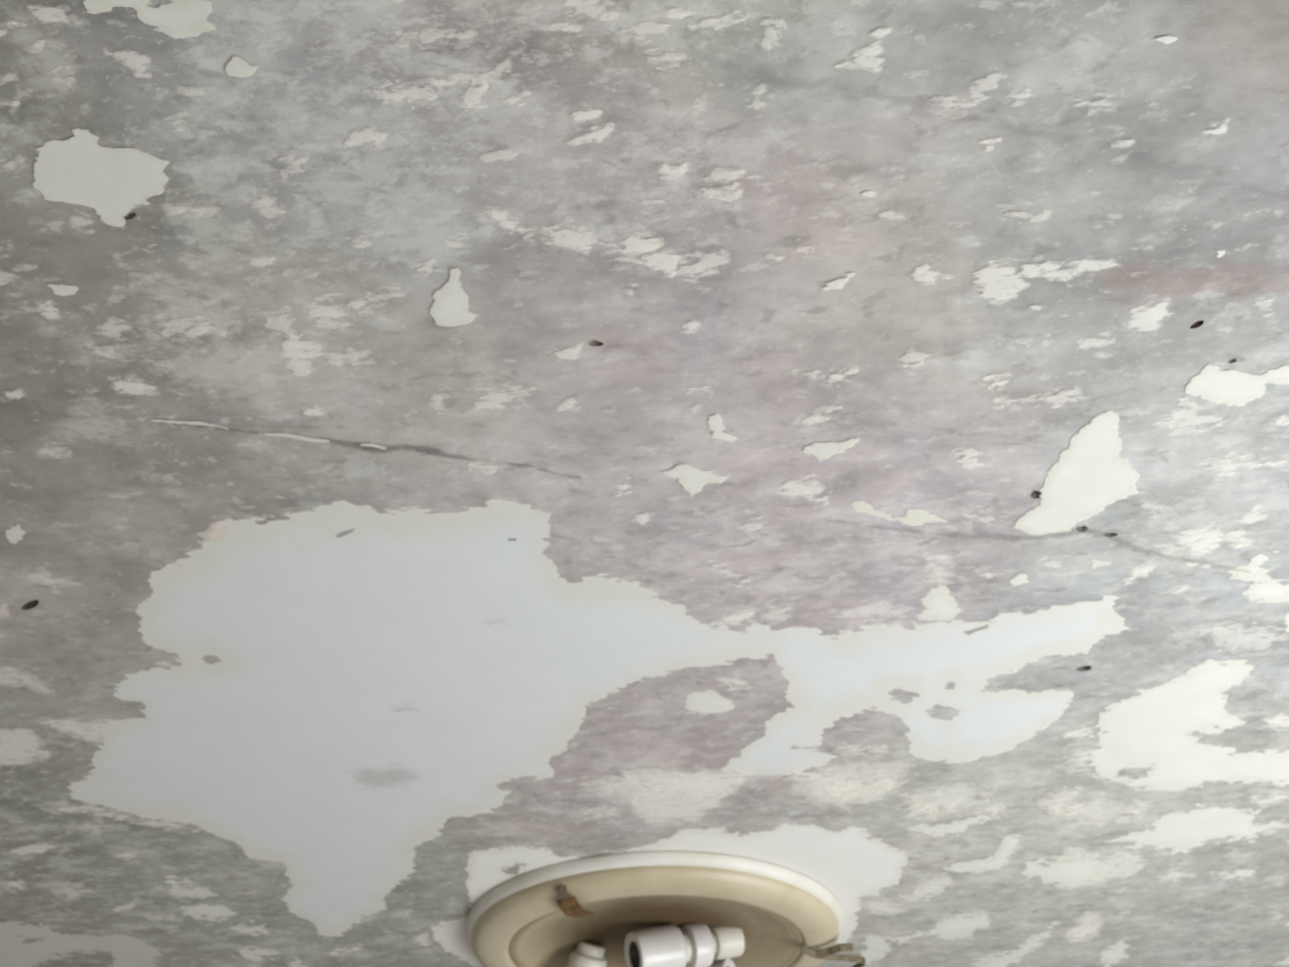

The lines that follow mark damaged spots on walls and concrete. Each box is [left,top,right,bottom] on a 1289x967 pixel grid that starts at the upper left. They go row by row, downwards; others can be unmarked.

peeling [0,5,68,37]
peeling [83,0,215,38]
peeling [4,129,216,234]
peeling [37,284,78,319]
peeling [430,268,478,327]
peeling [1126,298,1173,331]
peeling [1153,358,1289,436]
crack [150,420,582,479]
peeling [662,464,729,497]
peeling [777,438,860,505]
peeling [1013,411,1162,536]
peeling [0,499,1289,967]